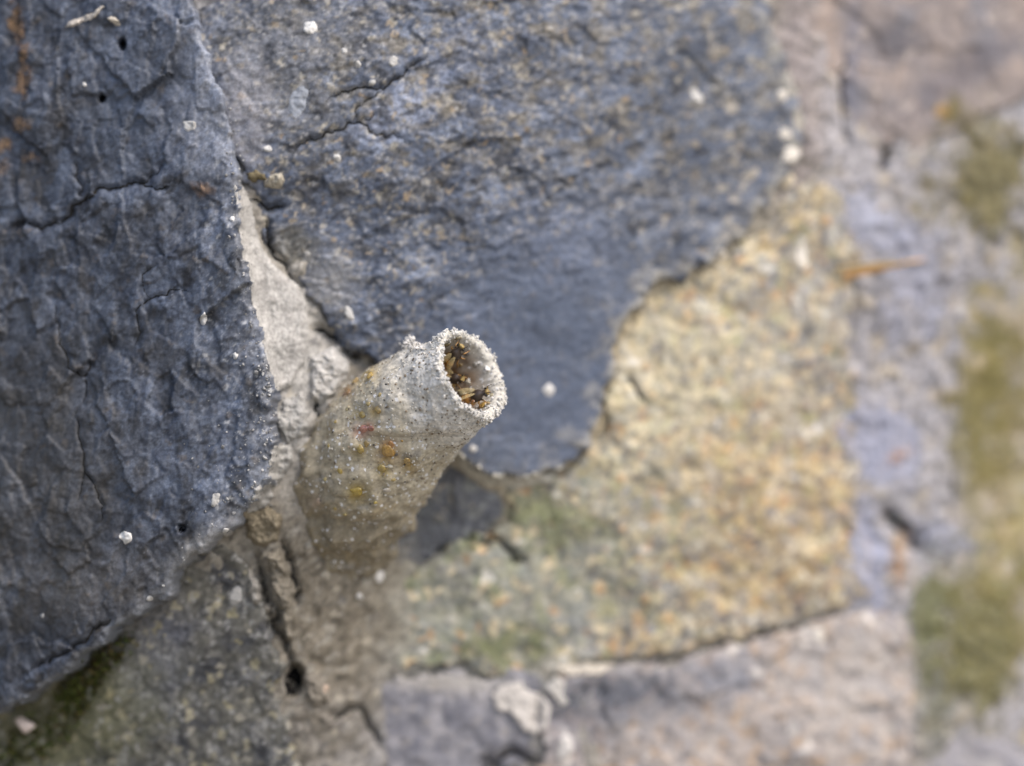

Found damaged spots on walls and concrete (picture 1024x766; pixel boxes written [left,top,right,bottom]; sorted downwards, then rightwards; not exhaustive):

crack [294,59,424,153]
crack [1,164,167,230]
crack [135,267,188,342]
crack [254,539,299,673]